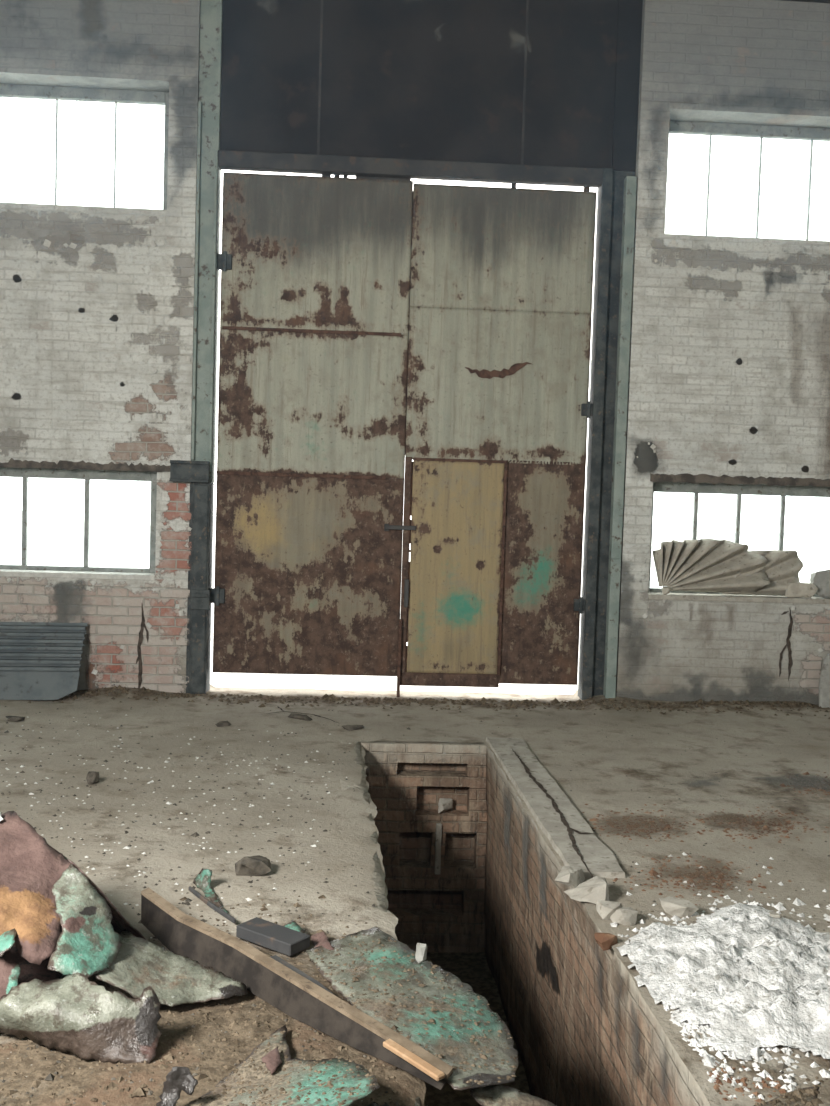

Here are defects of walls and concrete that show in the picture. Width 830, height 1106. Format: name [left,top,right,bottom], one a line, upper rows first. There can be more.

spalling [0,375,192,693]
crack [136,605,149,688]
crack [779,607,793,681]